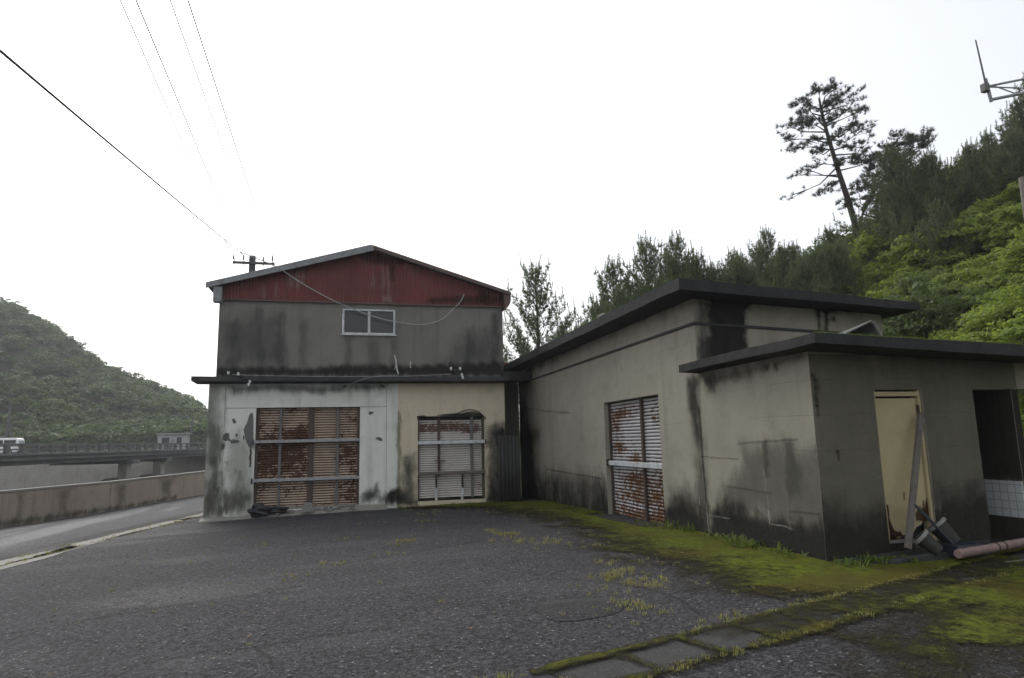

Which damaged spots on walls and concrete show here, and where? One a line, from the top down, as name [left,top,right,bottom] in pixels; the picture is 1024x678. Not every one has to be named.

leakage [699,300,749,359]
peeling [221,413,255,450]
leakage [688,376,717,432]
leakage [204,429,250,515]
leakage [664,501,915,561]
leakage [935,494,1024,543]